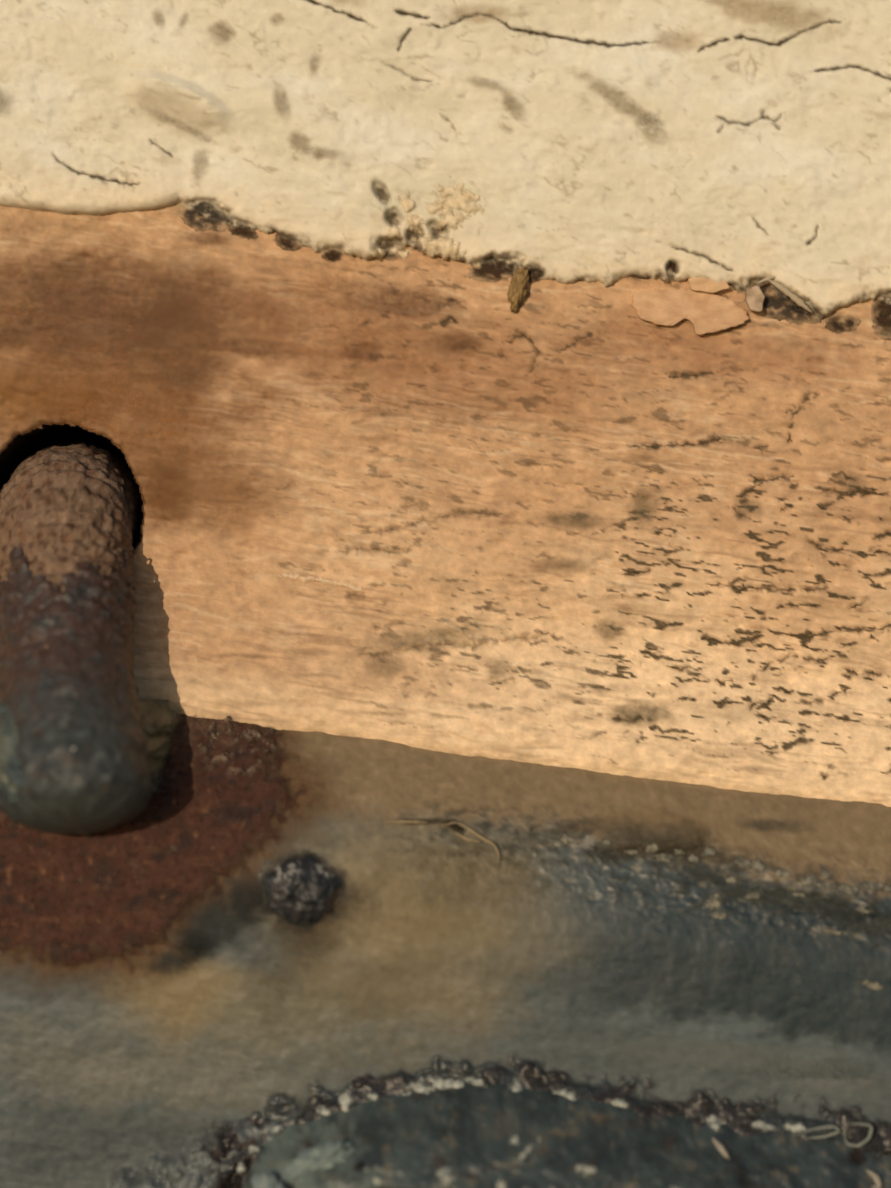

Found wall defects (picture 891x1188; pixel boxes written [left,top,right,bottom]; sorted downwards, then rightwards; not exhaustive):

crack [307,0,366,22]
crack [395,11,649,51]
crack [698,21,841,51]
crack [814,65,891,80]
crack [717,114,779,132]
spalling [185,201,253,236]
flaking render [371,183,483,261]
spalling [476,256,544,281]
peeling [632,262,815,335]
rust [0,268,248,523]
rust [0,713,320,976]
peeling [317,1092,354,1115]